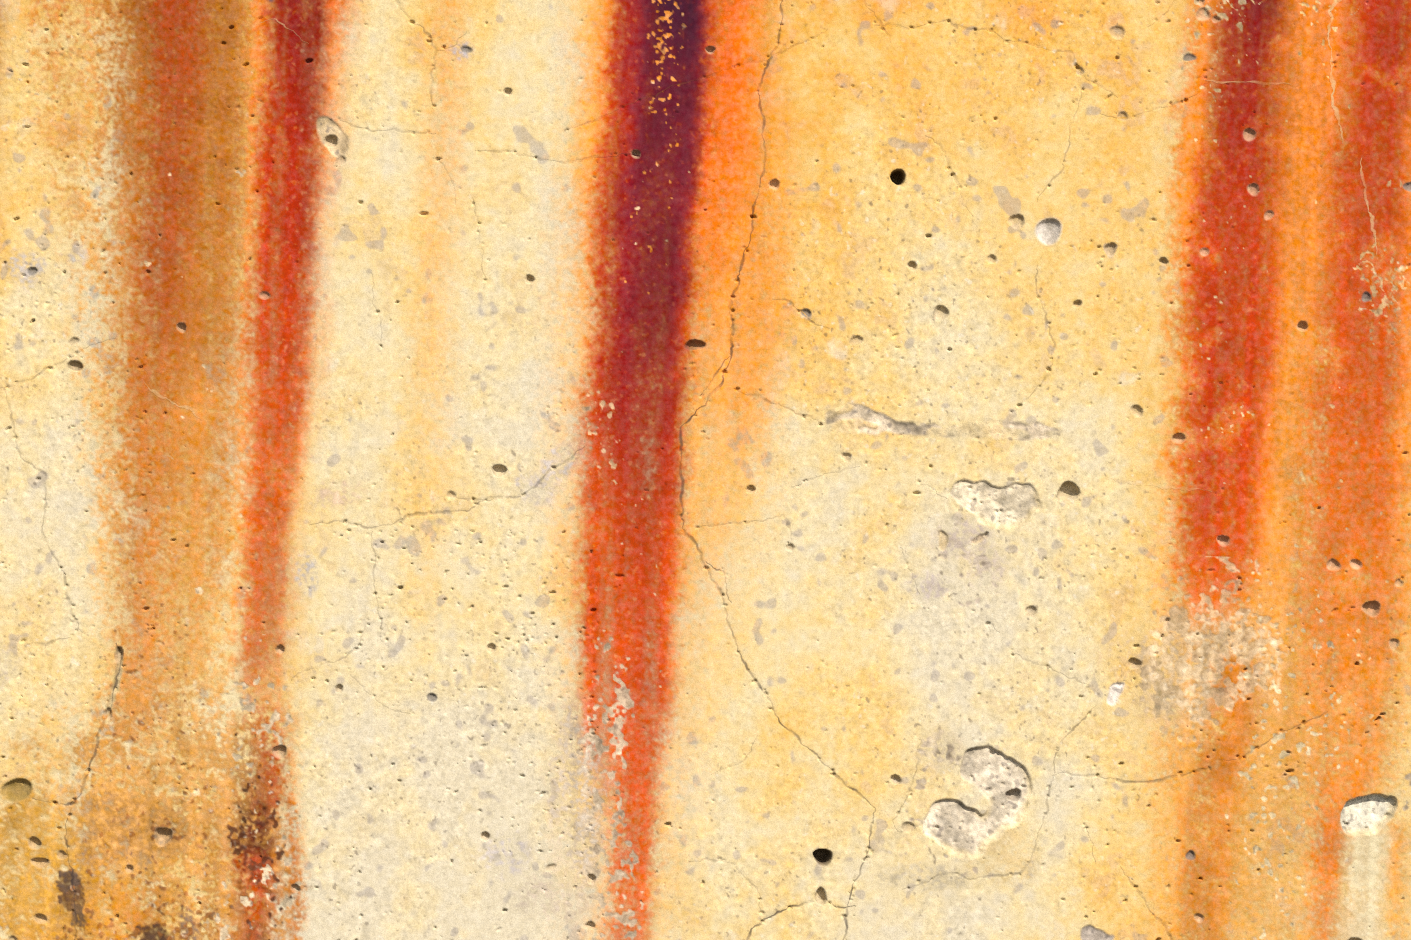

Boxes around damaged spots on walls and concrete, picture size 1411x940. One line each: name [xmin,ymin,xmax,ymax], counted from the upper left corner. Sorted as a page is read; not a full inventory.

crack [339,0,486,289]
crack [862,0,1289,201]
rust [0,0,373,940]
rust [390,0,478,686]
crack [291,446,585,715]
rust [524,0,831,940]
crack [478,0,923,940]
spalling [887,736,1035,884]
spalling [936,478,1044,619]
crack [1009,265,1056,415]
rust [1082,0,1411,940]
peeling [1105,556,1411,940]